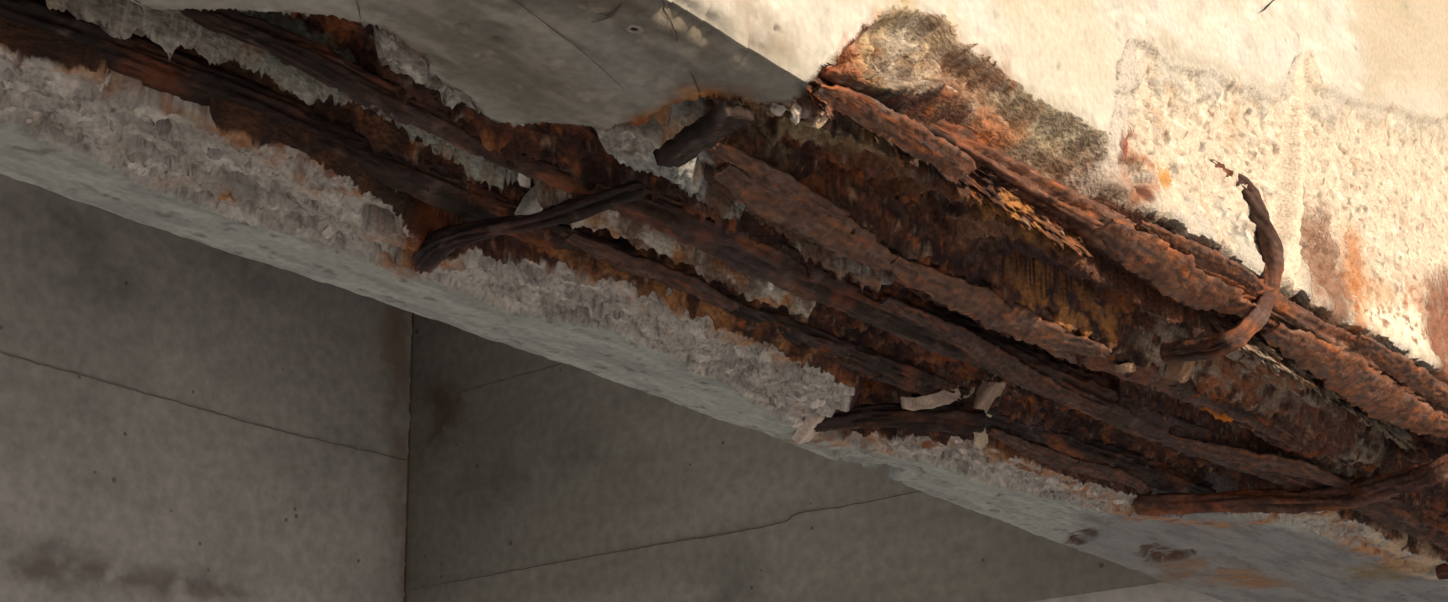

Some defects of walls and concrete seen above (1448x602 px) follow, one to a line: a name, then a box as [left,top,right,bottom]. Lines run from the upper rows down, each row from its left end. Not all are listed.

corrosion [811,84,976,181]
corrosion [1134,169,1172,199]
spalling [46,0,1448,482]
corrosion [705,141,1112,414]
corrosion [1093,218,1265,315]
corrosion [1301,221,1340,311]
corrosion [1260,279,1448,444]
spalling [830,427,1168,517]
corrosion [1157,433,1352,490]
spalling [1066,528,1102,546]
spalling [1139,543,1198,563]
spalling [1223,509,1448,575]